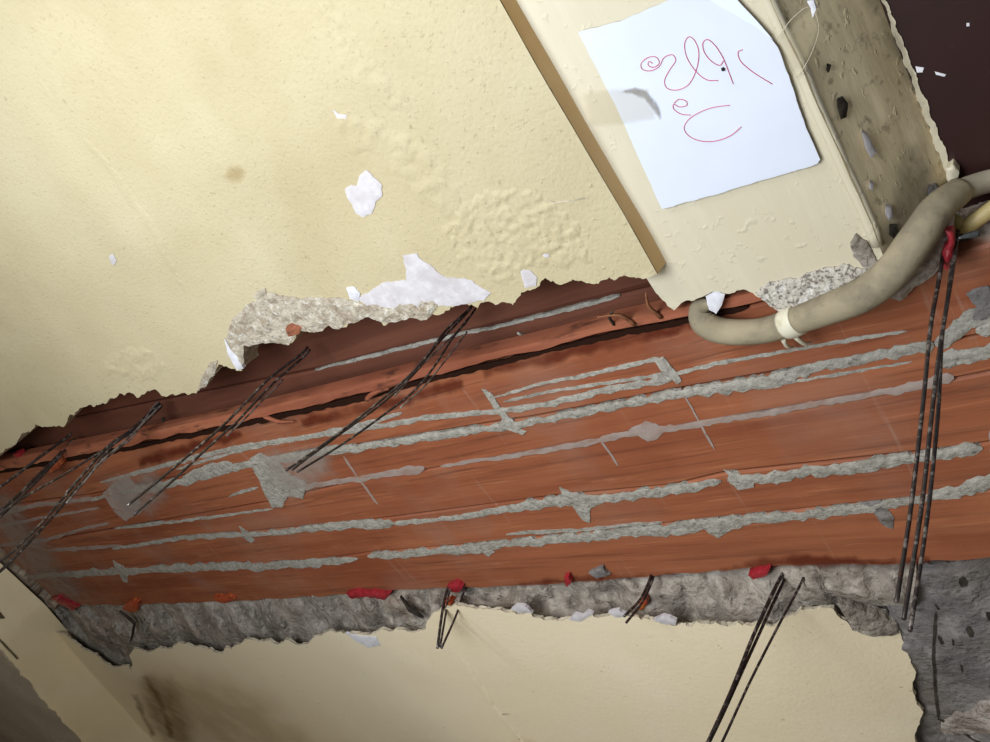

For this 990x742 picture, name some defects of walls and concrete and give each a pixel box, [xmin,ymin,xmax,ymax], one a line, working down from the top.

peeling [345,170,382,217]
peeling [521,269,537,288]
spalling [198,253,491,389]
peeling [706,291,725,314]
corrosion [140,433,240,465]
spalling [0,546,990,742]